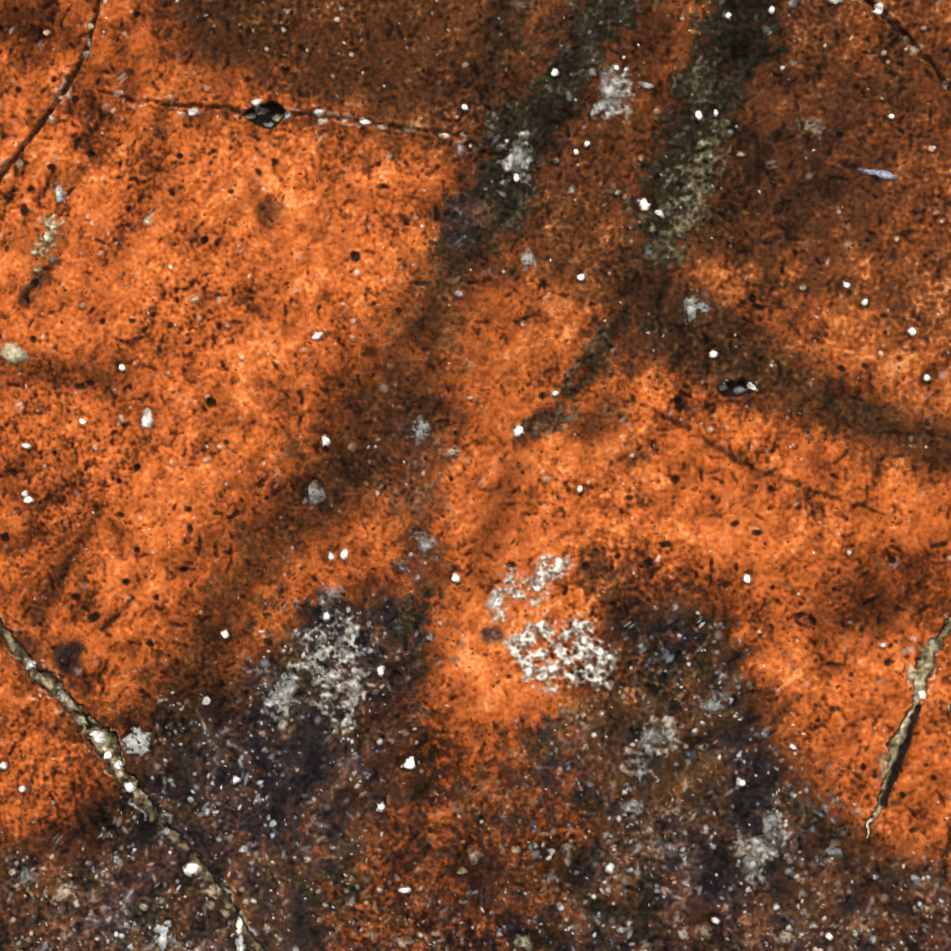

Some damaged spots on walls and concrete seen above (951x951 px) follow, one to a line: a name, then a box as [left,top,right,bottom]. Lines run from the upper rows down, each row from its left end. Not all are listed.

crack [0,0,106,206]
crack [162,99,263,116]
crack [288,109,456,137]
crack [102,597,134,631]
crack [866,615,951,838]
crack [0,618,263,951]
crack [941,824,951,878]